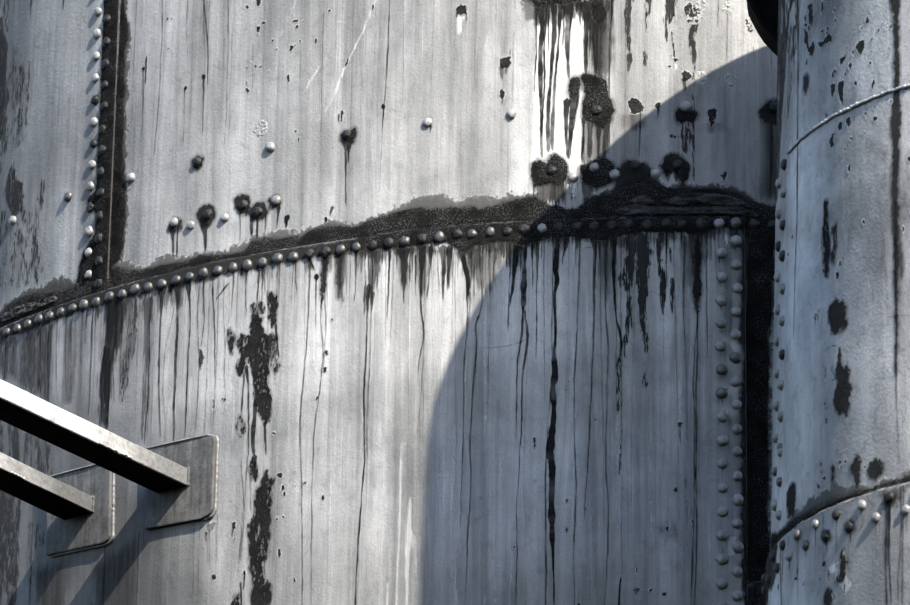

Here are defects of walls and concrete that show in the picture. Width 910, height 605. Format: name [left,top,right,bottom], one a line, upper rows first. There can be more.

rust [456,4,467,17]
rust [499,50,511,69]
rust [562,30,570,77]
rust [681,70,692,90]
rust [338,110,357,203]
rust [628,97,644,135]
rust [670,108,698,154]
rust [758,99,777,196]
rust [890,0,904,404]
rust [814,299,848,335]
rust [822,348,853,424]
rust [879,484,909,605]